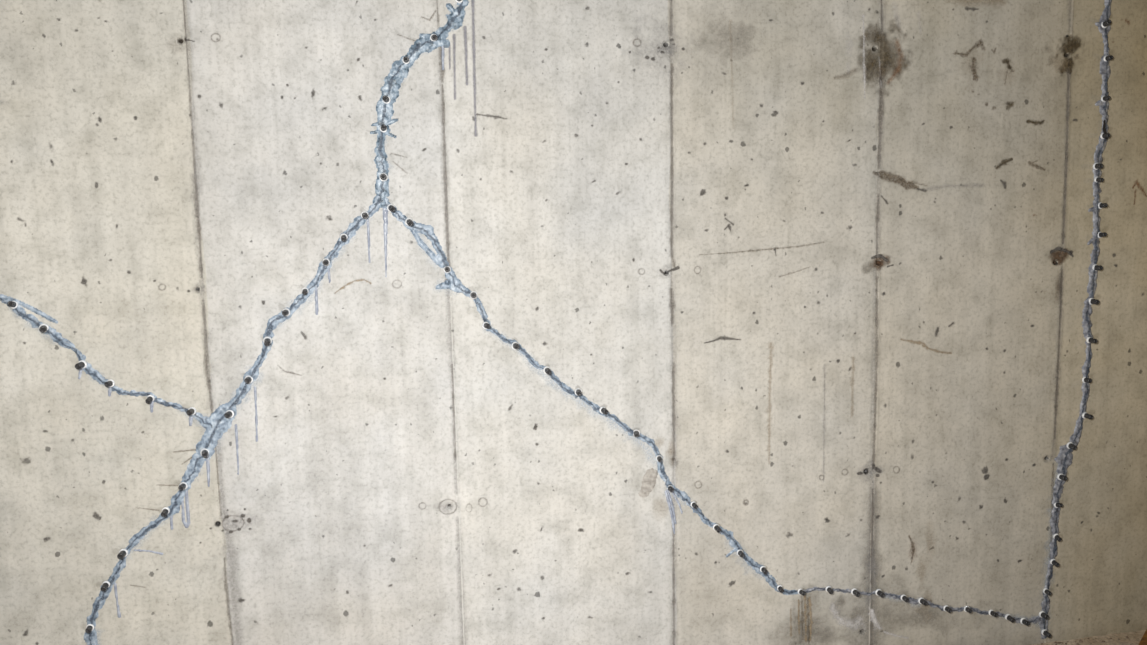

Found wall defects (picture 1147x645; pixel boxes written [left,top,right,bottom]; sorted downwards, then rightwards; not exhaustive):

crack [0,0,851,645]
water stain [862,9,906,98]
crack [858,590,1005,617]
crack [1013,0,1112,639]